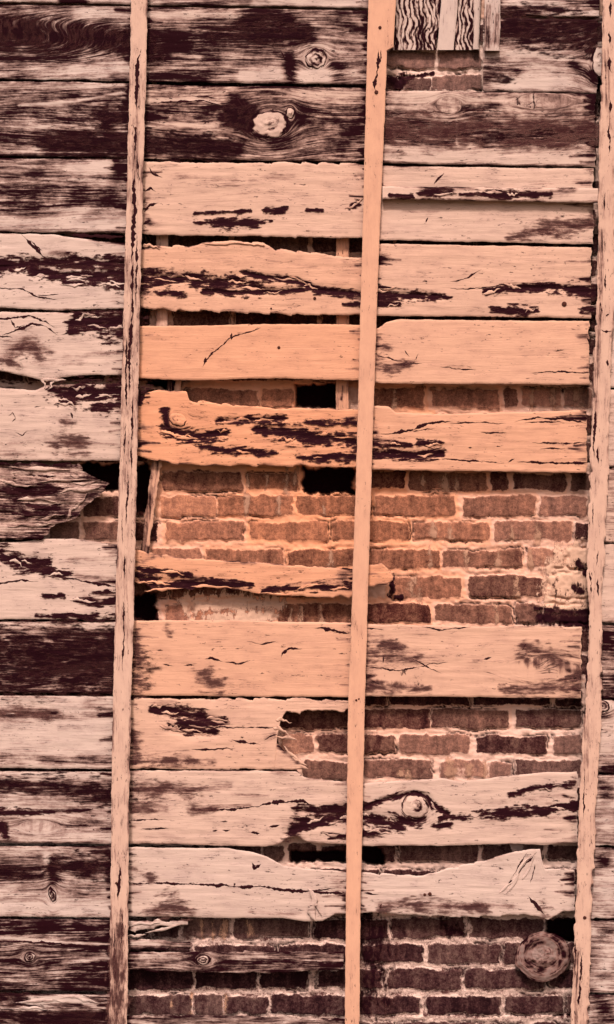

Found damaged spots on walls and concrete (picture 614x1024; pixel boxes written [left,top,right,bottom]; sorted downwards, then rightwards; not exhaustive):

peeling [434,188,553,200]
crack [0,55,271,670]
peeling [161,430,198,440]
peeling [0,466,101,528]
peeling [134,570,183,585]
peeling [265,584,348,596]
spalling [387,573,404,602]
spalling [536,537,589,610]
spalling [271,726,308,770]
peeling [128,921,182,938]